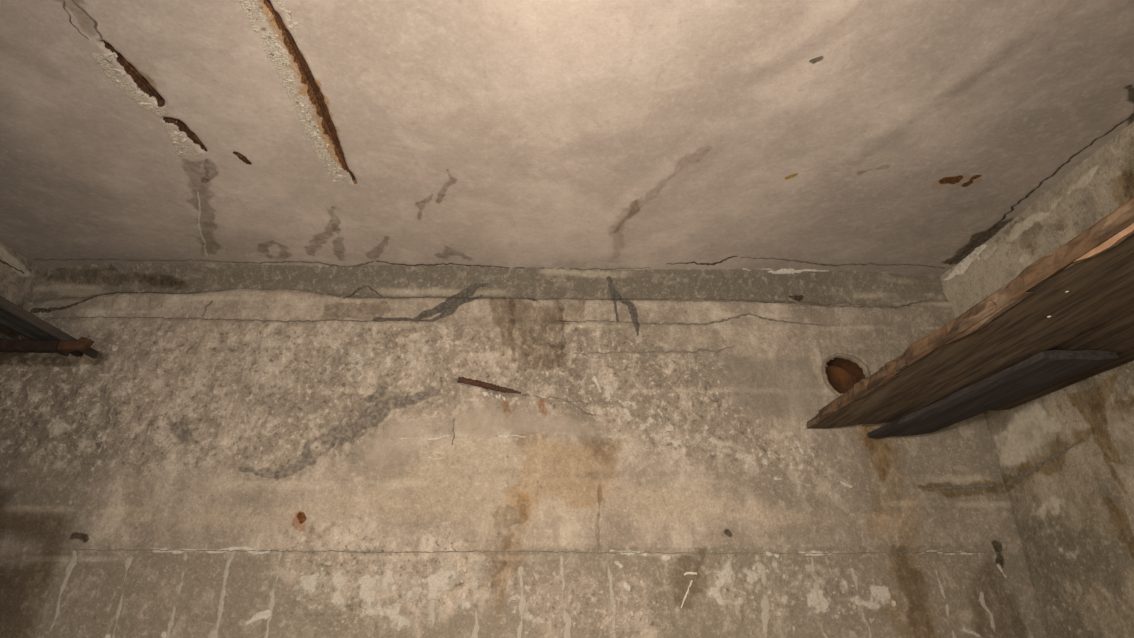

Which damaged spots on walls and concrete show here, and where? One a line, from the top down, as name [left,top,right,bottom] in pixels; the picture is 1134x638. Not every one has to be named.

spalling [90,40,207,156]
spalling [238,0,357,184]
crack [0,113,1134,322]
corrosion [939,175,982,187]
crack [477,298,928,355]
damp [246,609,271,625]